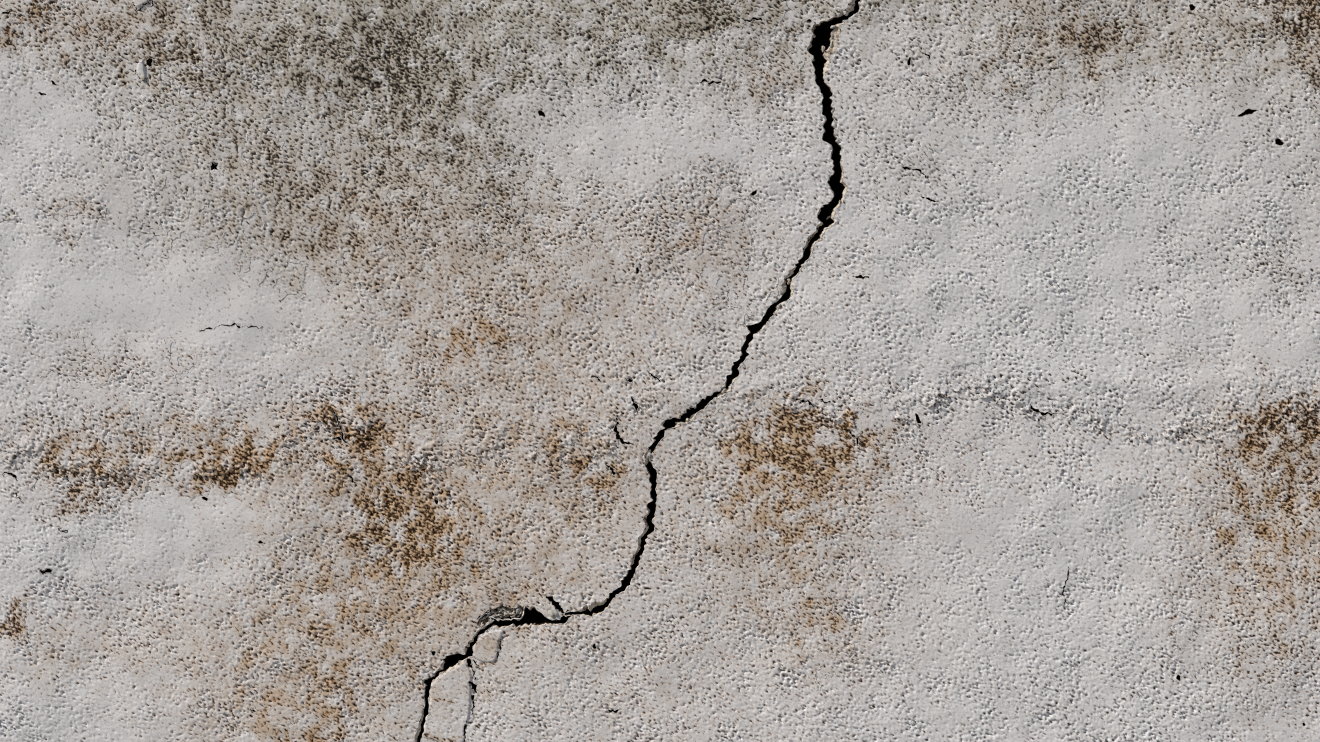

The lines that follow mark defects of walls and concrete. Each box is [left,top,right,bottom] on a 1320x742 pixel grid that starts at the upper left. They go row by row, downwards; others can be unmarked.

crack [414,0,861,742]